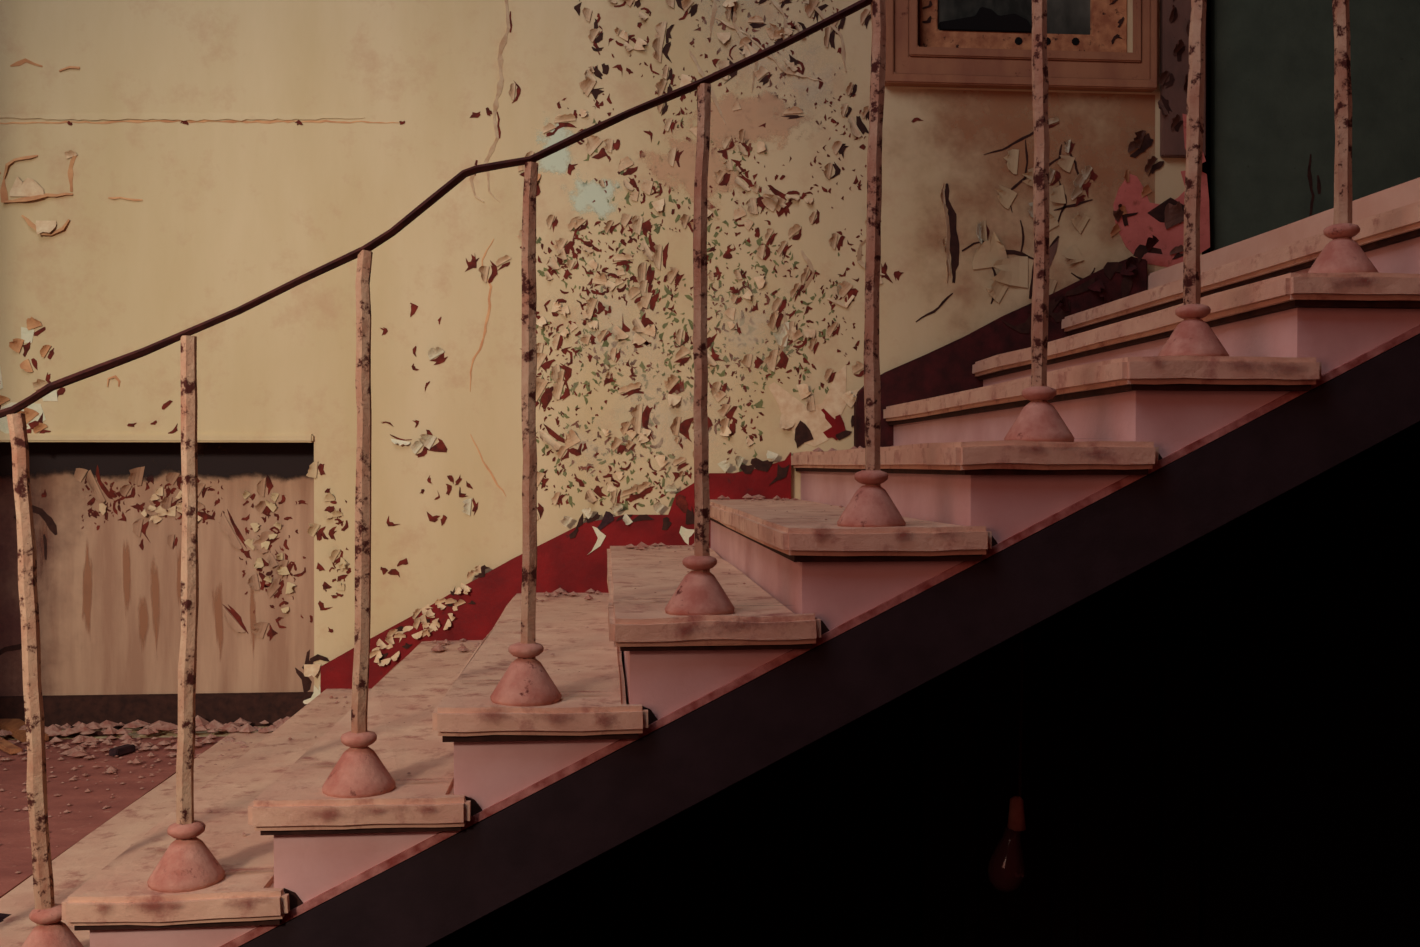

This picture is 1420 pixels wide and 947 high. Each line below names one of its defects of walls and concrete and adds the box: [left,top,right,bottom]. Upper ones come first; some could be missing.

crack [0,112,405,126]
crack [469,0,512,202]
spalling [995,0,1210,334]
peeling [0,317,65,433]
peeling [411,346,447,390]
crack [466,239,498,392]
flaking render [466,0,904,553]
peeling [74,461,351,640]
peeling [380,558,408,577]
peeling [383,420,447,457]
peeling [421,475,478,526]
crack [470,434,506,496]